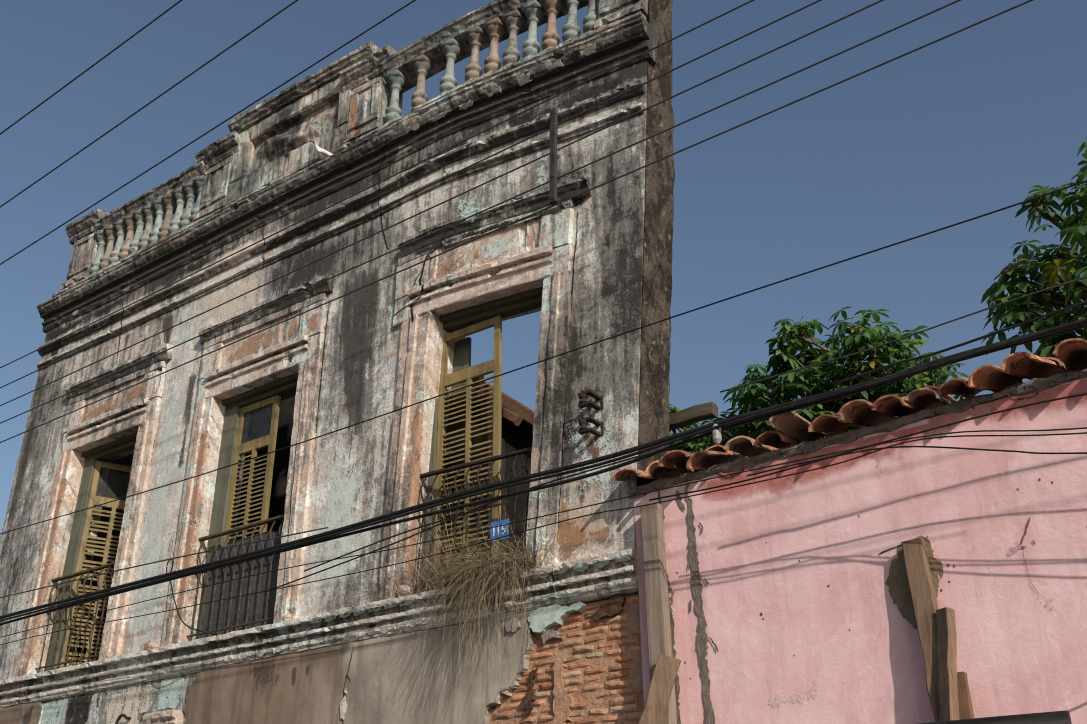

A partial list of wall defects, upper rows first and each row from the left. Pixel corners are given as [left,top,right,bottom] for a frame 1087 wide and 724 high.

water stain [507,76,622,129]
water stain [402,137,472,185]
water stain [265,195,371,253]
water stain [398,175,592,258]
water stain [198,244,379,451]
peeling [175,430,209,628]
spalling [886,543,917,629]
spalling [914,535,955,598]
crack [1021,517,1041,597]
flaking render [485,589,644,724]
peeling [39,698,67,724]
peeling [104,676,187,724]